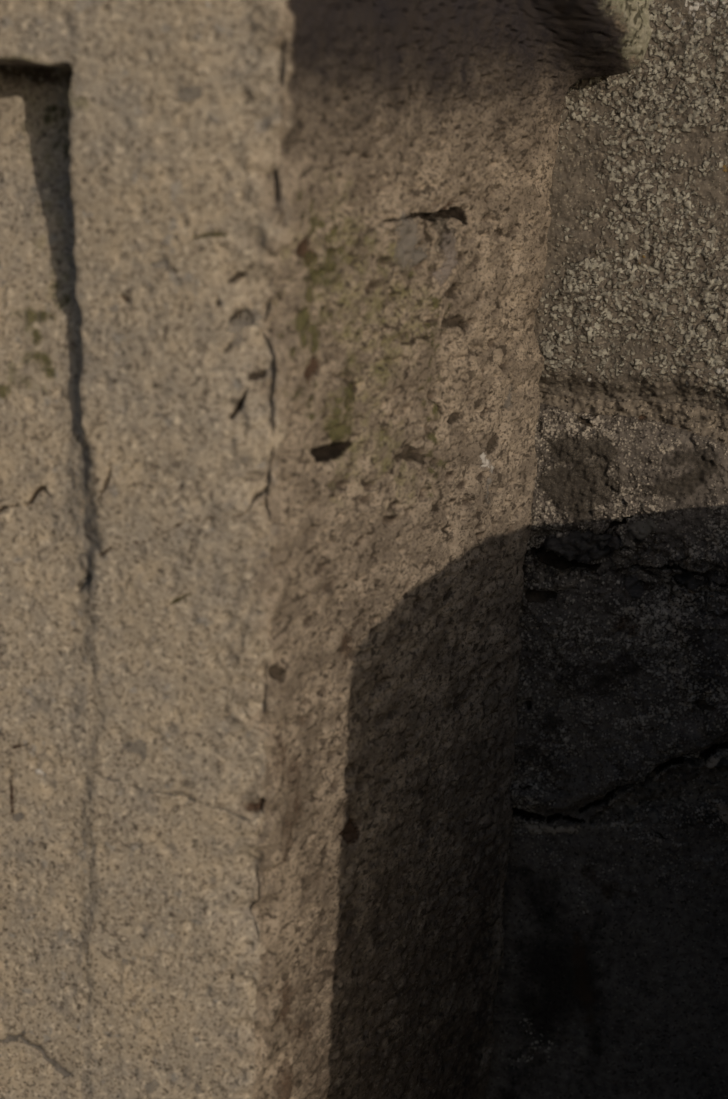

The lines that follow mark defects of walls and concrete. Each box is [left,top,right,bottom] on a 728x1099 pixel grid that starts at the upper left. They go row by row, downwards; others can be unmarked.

crack [589,512,728,588]
crack [512,741,728,824]
crack [0,1030,71,1077]